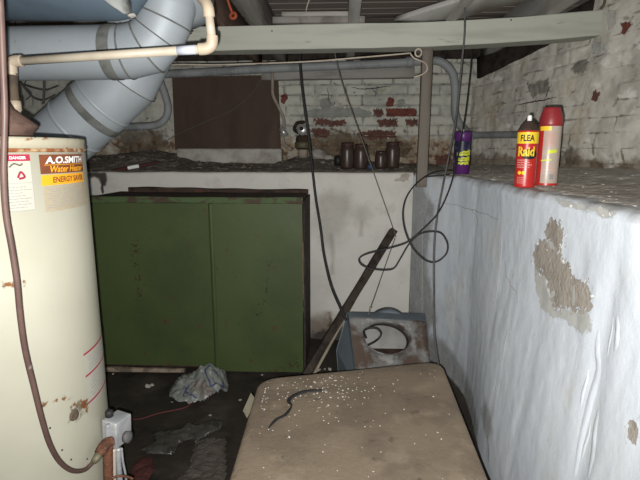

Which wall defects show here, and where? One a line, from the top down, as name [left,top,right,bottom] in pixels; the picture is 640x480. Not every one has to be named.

peeling [605,10,633,35]
flaking render [309,117,347,138]
flaking render [353,96,419,141]
water stain [308,128,387,156]
spalling [555,199,616,218]
peeling [531,217,594,334]
peeling [624,420,638,446]